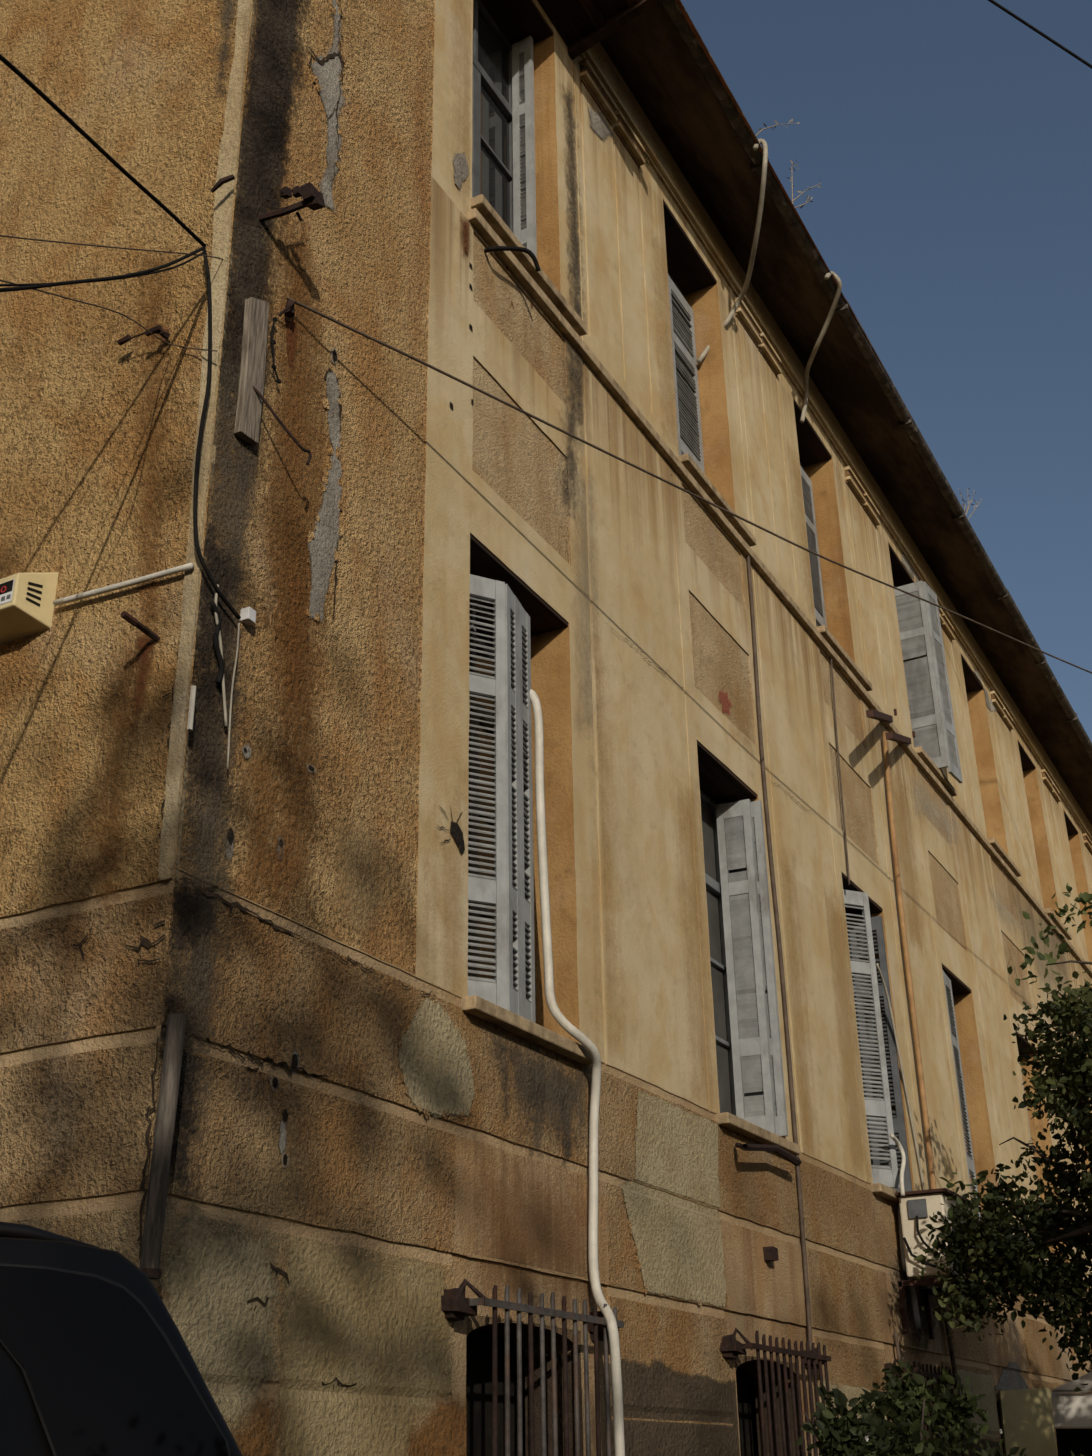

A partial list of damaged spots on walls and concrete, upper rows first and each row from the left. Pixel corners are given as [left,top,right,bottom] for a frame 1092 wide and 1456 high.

peeling [311,0,345,209]
peeling [453,152,469,189]
leakage [563,90,584,318]
peeling [306,347,343,622]
leakage [563,343,584,506]
leakage [161,0,310,1206]
leakage [494,1037,588,1162]